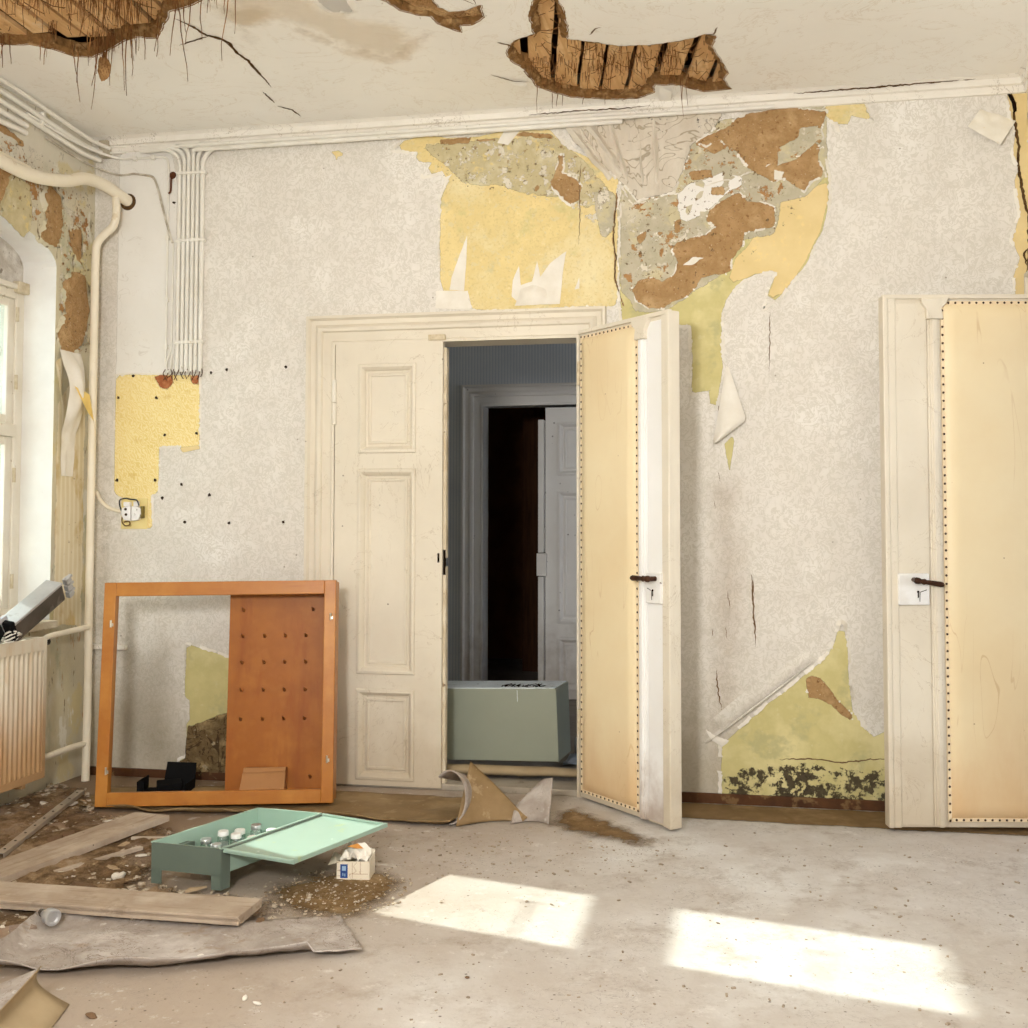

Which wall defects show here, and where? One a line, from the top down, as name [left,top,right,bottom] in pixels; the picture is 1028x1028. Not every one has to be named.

crack [177,19,300,116]
spalling [0,124,67,174]
flaking render [425,106,828,312]
crack [1011,94,1028,272]
spalling [0,168,93,354]
spalling [180,713,227,779]
damp [724,758,885,801]
spalling [805,676,853,720]